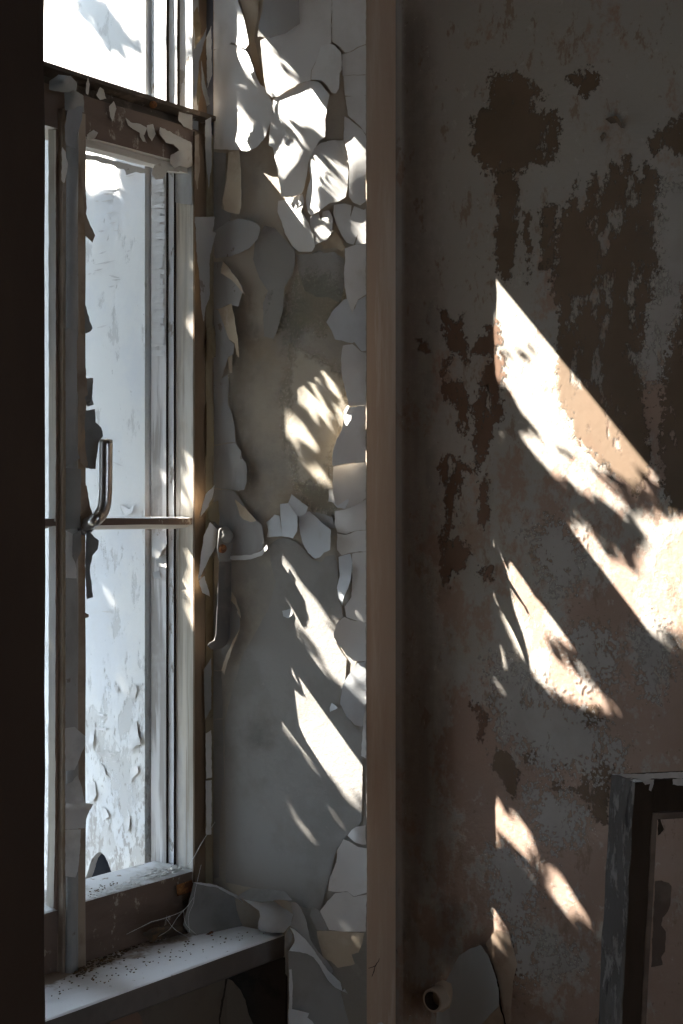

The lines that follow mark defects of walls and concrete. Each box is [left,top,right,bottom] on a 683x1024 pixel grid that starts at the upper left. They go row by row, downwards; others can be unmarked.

peeling [86,79,156,143]
peeling [175,0,366,878]
peeling [310,826,367,968]
flaking render [227,979,253,1024]